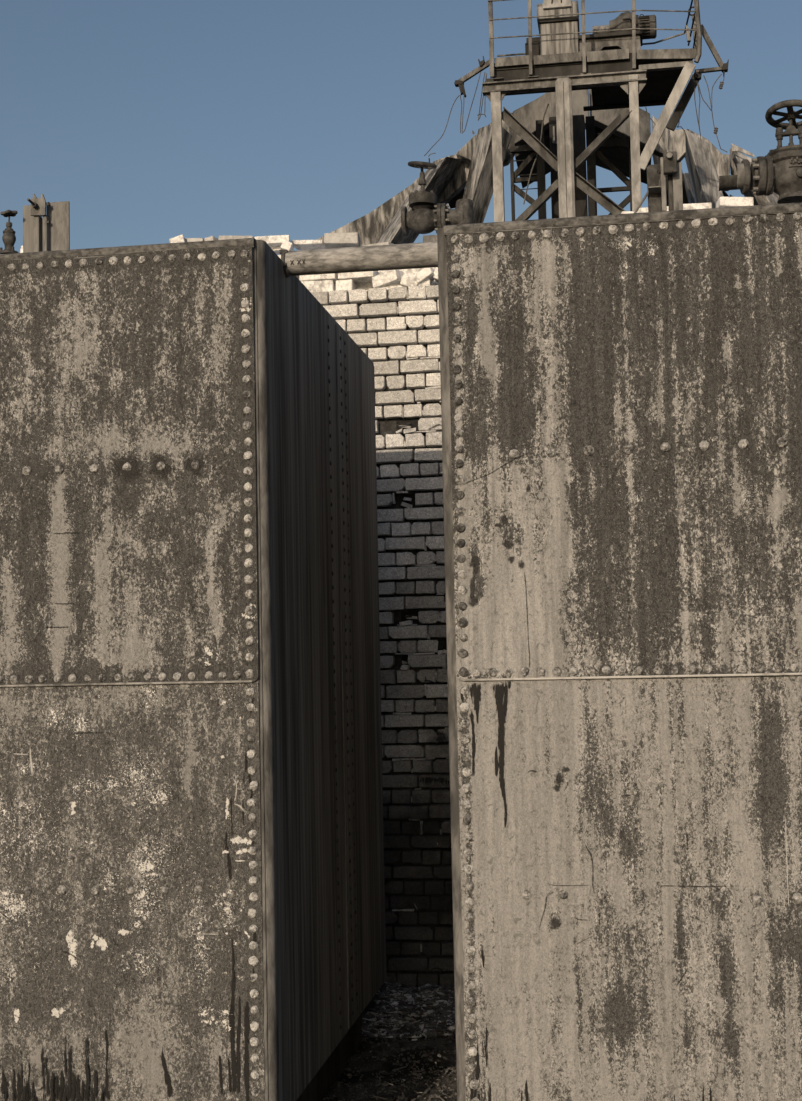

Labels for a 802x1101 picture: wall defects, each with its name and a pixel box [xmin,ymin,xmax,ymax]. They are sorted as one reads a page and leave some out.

spalling [396,420,419,434]
rust [113,456,170,482]
rust [184,459,205,475]
rust [504,539,524,568]
rust [469,556,480,607]
spalling [437,640,447,655]
rust [553,767,570,791]